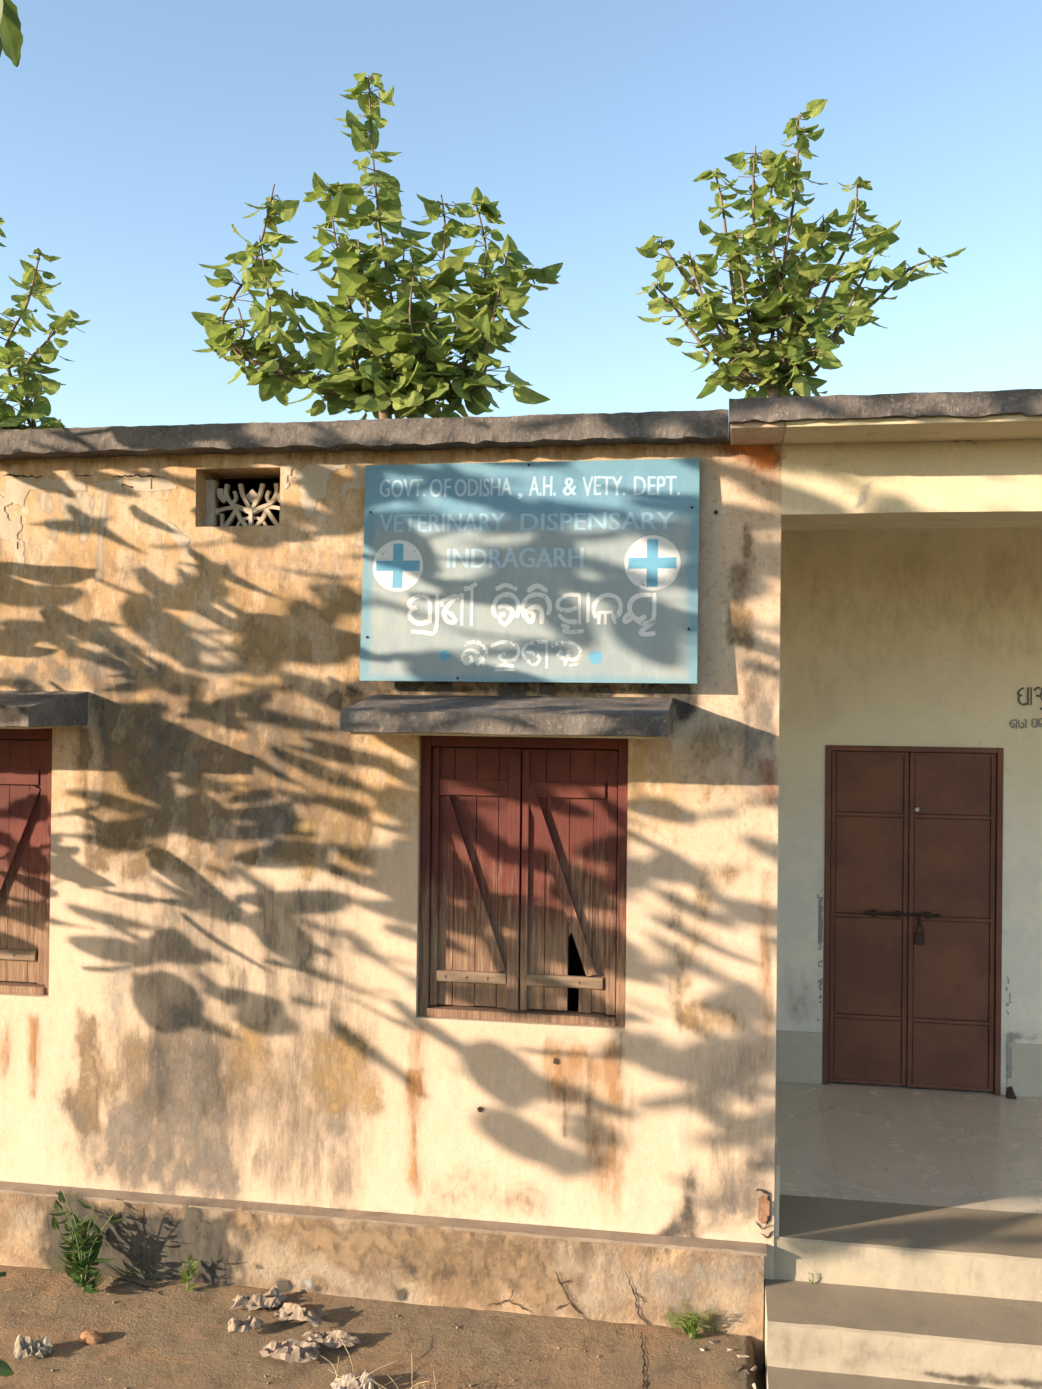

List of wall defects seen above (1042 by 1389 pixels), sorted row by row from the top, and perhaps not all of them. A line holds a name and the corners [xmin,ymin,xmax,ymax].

damp [730,527,778,793]
damp [0,650,697,974]
damp [39,973,581,1318]
corrosion [408,1070,422,1185]
corrosion [545,1044,620,1135]
crack [489,1271,587,1320]
damp [926,1373,1042,1389]